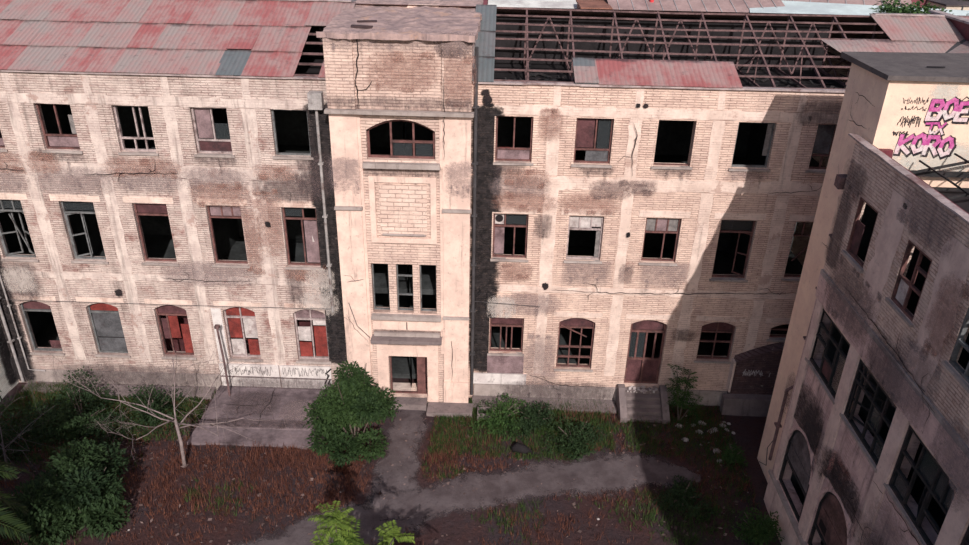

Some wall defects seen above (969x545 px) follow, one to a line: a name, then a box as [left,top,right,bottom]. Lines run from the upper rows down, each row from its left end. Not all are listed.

crack [355,39,372,105]
water stain [475,288,514,318]